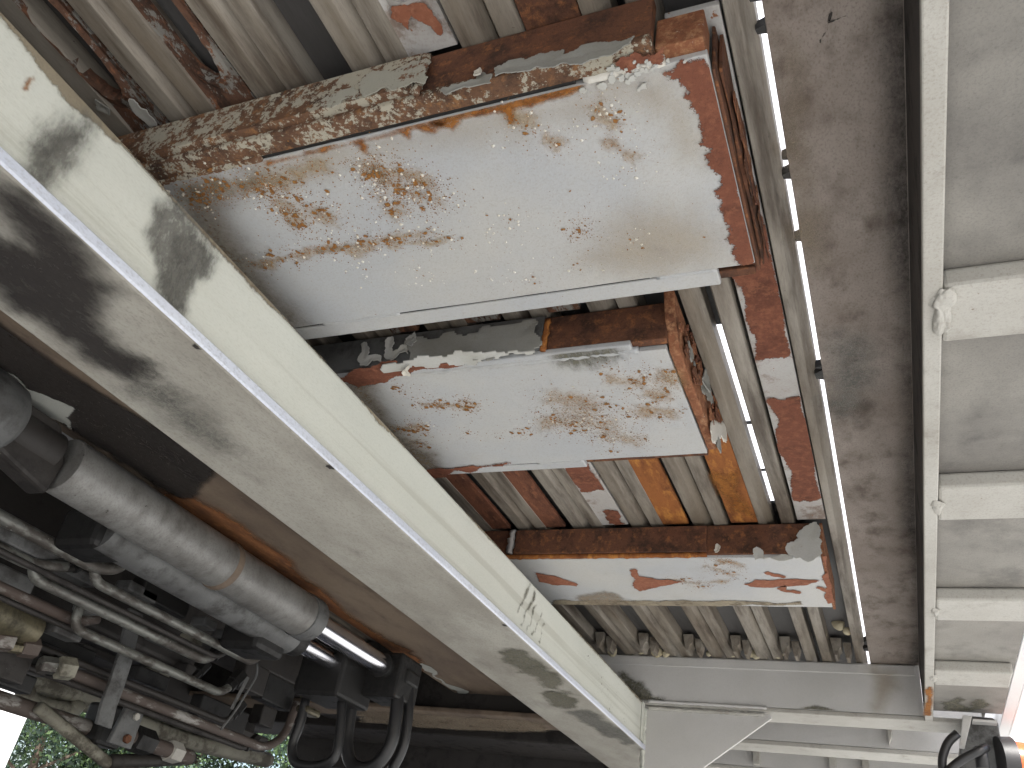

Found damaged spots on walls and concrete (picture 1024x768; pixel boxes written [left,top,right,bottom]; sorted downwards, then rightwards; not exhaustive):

peeling [440,36,673,95]
damp [0,12,291,323]
rust [158,47,793,361]
damp [0,325,214,499]
damp [0,188,226,449]
peeling [357,319,542,376]
rust [340,322,721,457]
rust [565,462,604,493]
rust [162,490,423,672]
peeling [629,569,680,591]
peeling [744,522,835,604]
damp [499,649,634,745]